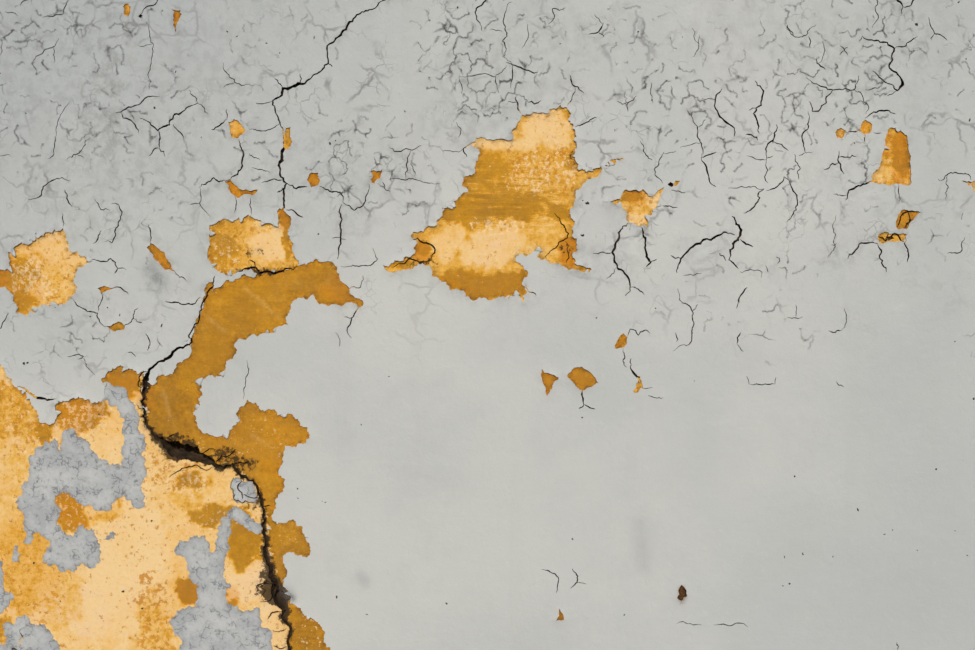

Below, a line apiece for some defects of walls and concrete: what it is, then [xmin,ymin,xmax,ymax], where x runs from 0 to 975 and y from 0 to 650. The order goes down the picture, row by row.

crack [29,0,439,288]
crack [426,0,564,156]
peeling [384,102,623,301]
crack [545,213,569,263]
peeling [603,181,680,227]
crack [593,0,947,349]
peeling [835,120,872,138]
peeling [869,128,911,188]
crack [68,200,293,650]
peeling [0,206,363,650]
peeling [541,366,598,396]
crack [623,329,662,399]